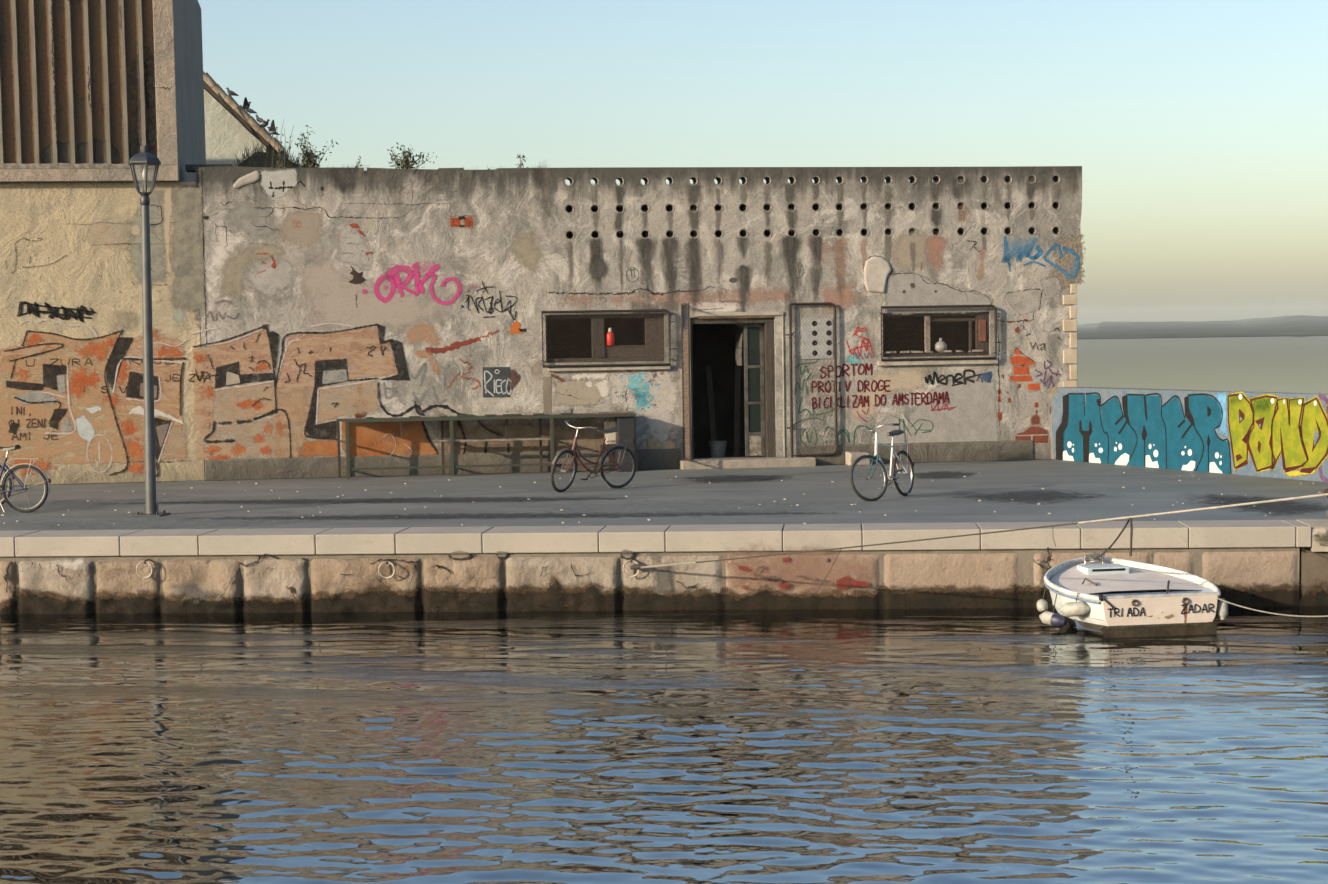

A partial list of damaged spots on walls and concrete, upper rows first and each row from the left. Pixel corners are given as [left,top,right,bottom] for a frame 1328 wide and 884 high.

damp [589,184,623,286]
damp [632,184,701,314]
damp [737,183,844,312]
damp [884,186,892,263]
damp [910,179,1011,269]
damp [1027,178,1076,220]
peeling [850,232,1085,444]
damp [171,584,221,602]